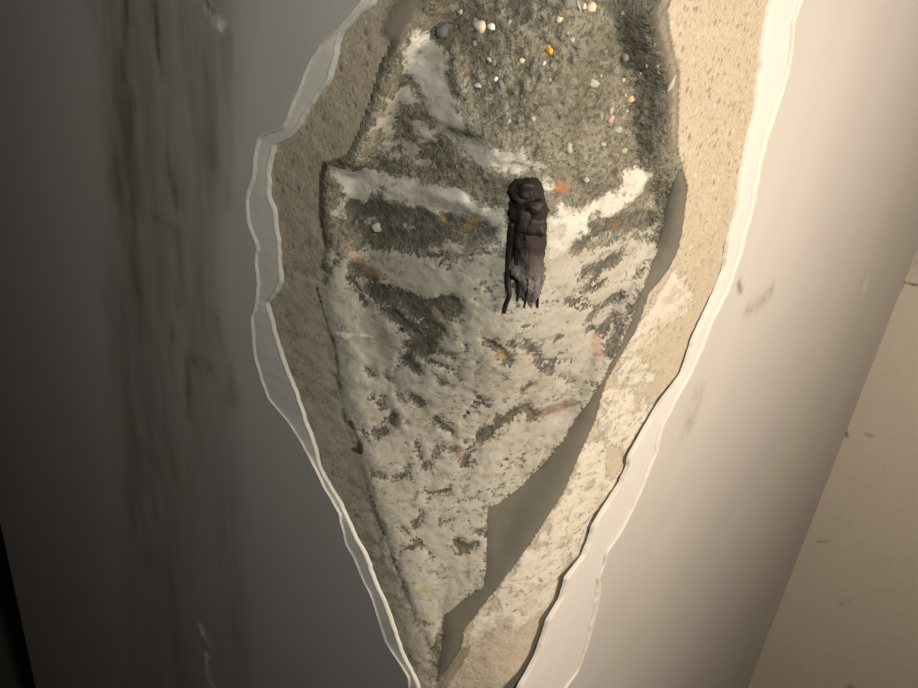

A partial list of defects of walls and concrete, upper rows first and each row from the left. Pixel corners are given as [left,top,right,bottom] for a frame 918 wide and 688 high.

spalling [245,0,803,688]